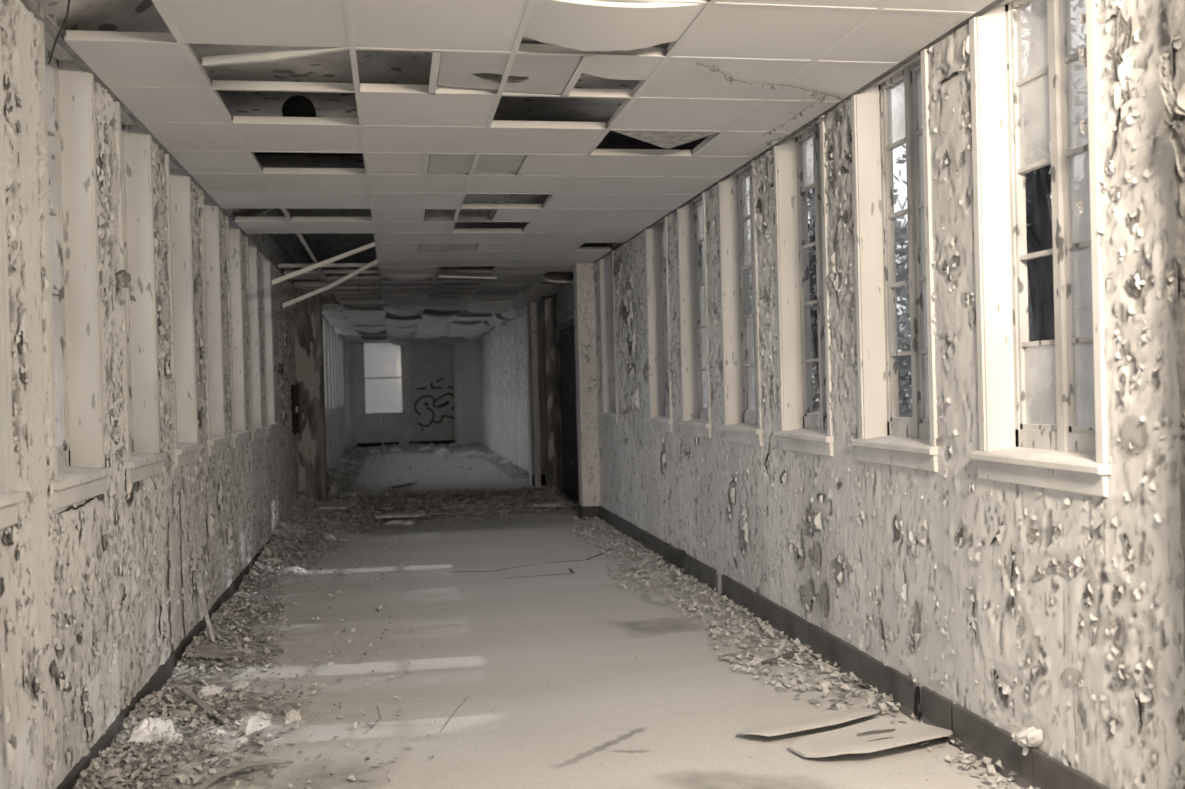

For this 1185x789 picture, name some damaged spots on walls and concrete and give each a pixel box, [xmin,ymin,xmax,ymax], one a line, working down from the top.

peeling [754,154,779,318]
peeling [824,106,857,402]
peeling [933,90,972,181]
peeling [1078,11,1087,67]
peeling [1097,159,1185,410]
peeling [568,228,1185,789]